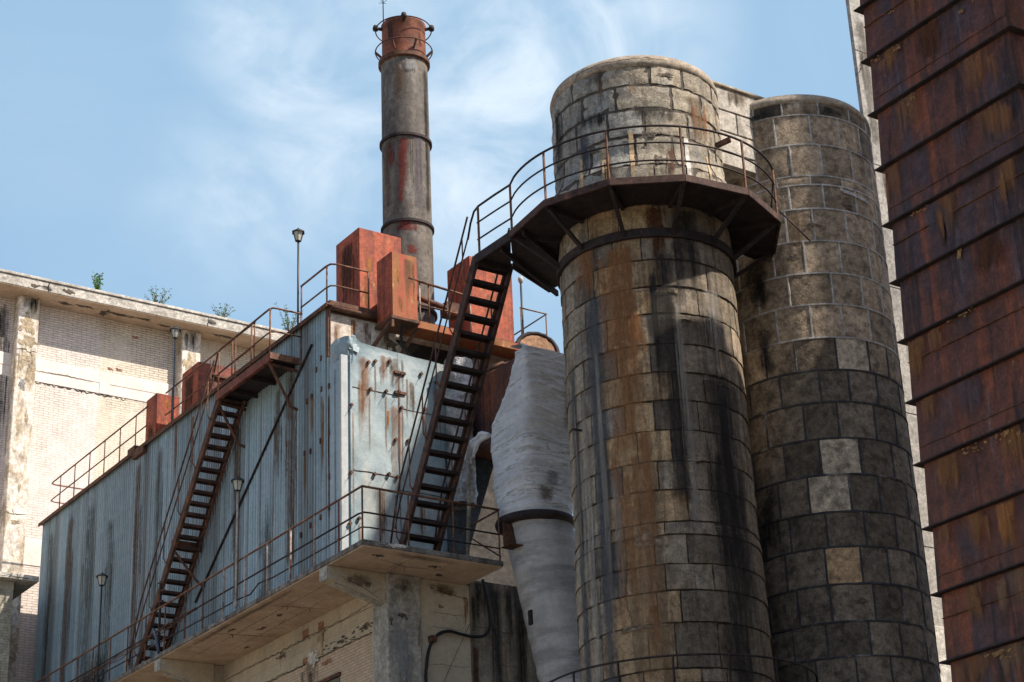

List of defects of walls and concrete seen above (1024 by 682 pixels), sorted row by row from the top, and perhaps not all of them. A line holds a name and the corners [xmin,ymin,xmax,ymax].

peeling [16,311,40,391]
corrosion [352,332,414,504]
leakage [650,248,680,404]
corrosion [909,328,941,373]
corrosion [969,500,1013,542]
leakage [60,521,73,682]